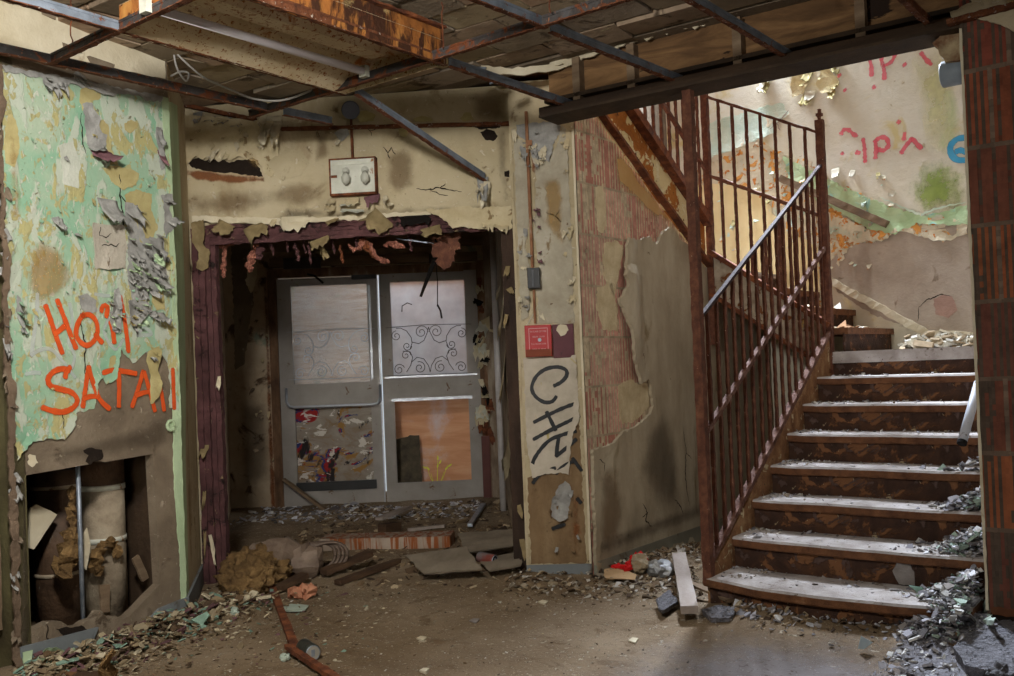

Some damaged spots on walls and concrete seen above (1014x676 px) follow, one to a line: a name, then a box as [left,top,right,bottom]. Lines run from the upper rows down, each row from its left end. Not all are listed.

peeling [0,64,576,667]
flaking render [517,68,973,572]
leakage [917,168,959,207]
flaking render [950,0,1014,32]